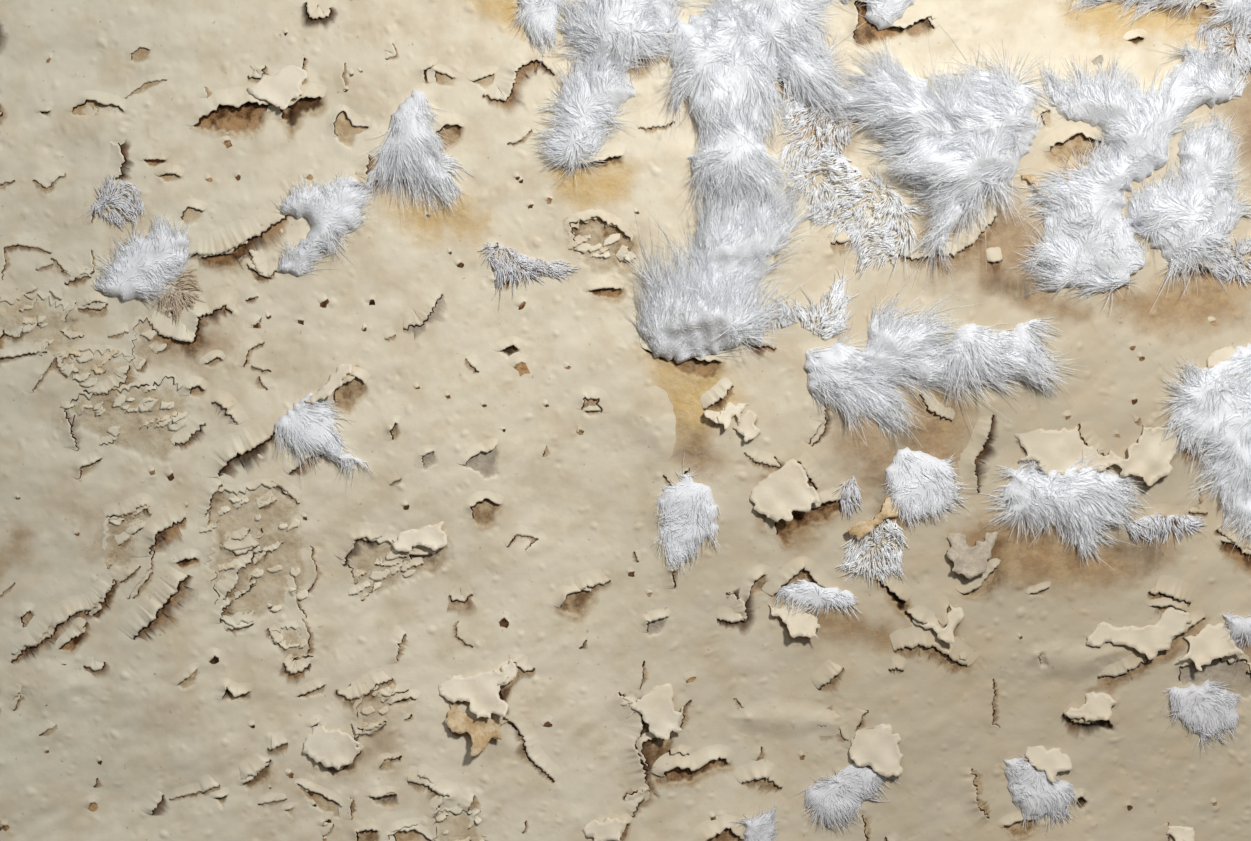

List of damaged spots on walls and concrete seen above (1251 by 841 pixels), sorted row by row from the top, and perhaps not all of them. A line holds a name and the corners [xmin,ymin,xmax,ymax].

water stain [1071,1,1249,36]
peeling [181,63,417,190]
water stain [560,170,625,202]
water stain [789,90,841,149]
water stain [936,212,1087,315]
peeling [0,260,421,802]
peeling [333,521,449,601]
peeling [438,653,535,757]
peeling [582,671,788,841]
peeling [716,459,846,639]
peeling [868,531,1001,673]
peeling [1061,575,1251,730]